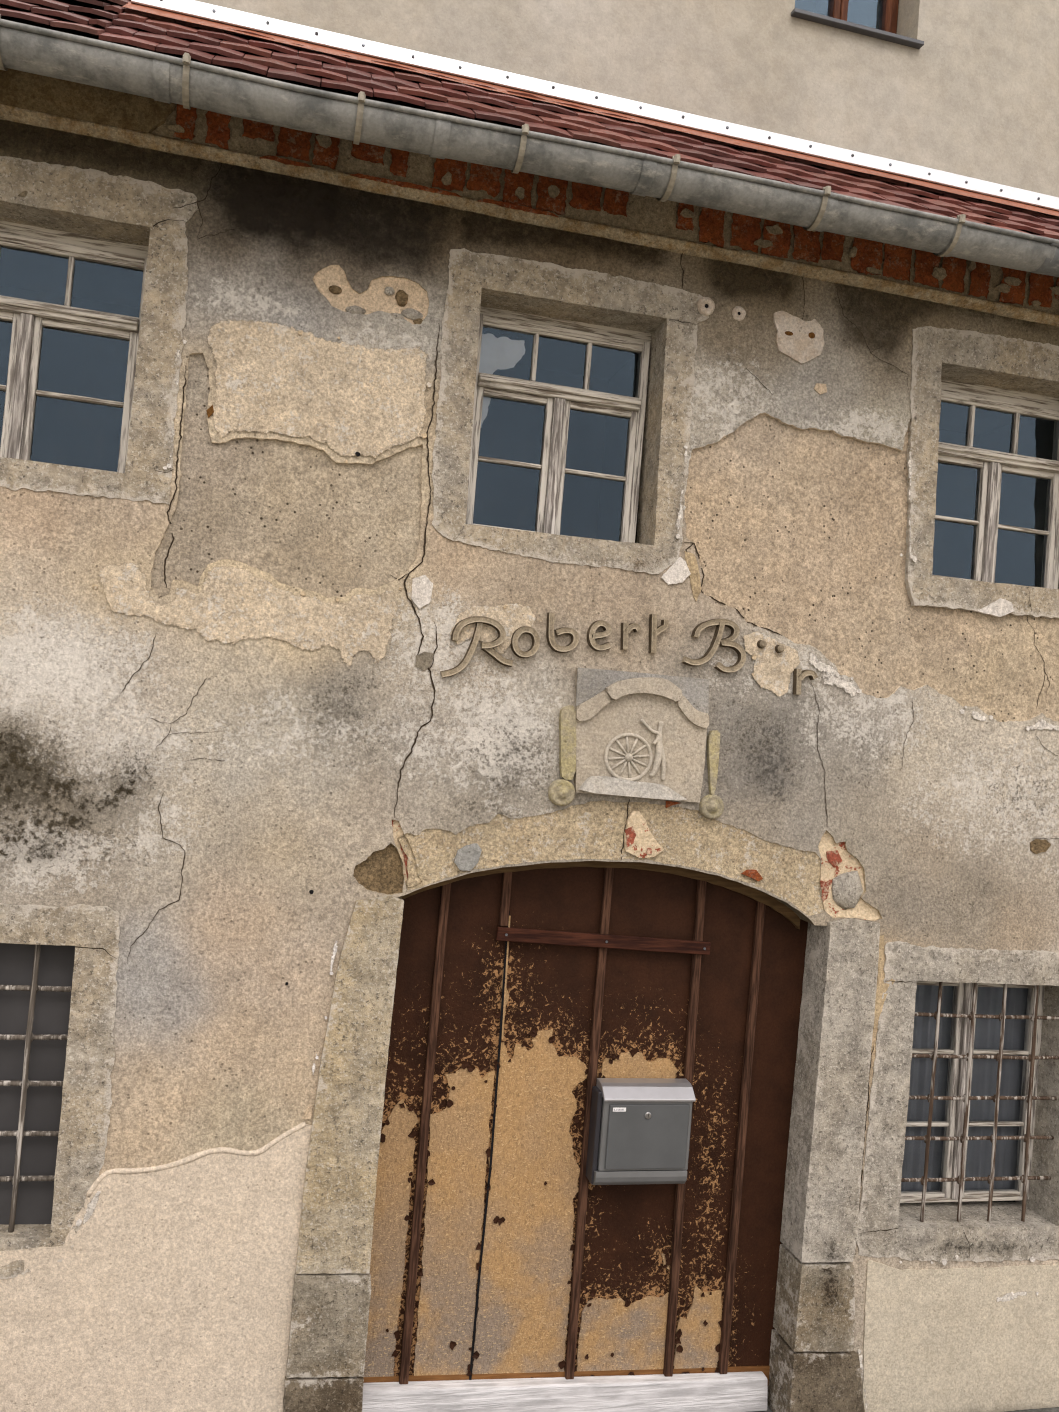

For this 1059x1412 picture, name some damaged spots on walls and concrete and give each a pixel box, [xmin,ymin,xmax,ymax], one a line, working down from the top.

flaking render [168,104,629,217]
spalling [312,265,429,325]
flaking render [676,203,1059,308]
crack [155,371,187,598]
flaking render [92,319,431,668]
crack [391,325,440,818]
flaking render [675,413,1059,731]
leakage [0,723,147,862]
crack [120,636,156,694]
crack [127,791,185,964]
crack [152,680,225,761]
spalling [353,800,895,1029]